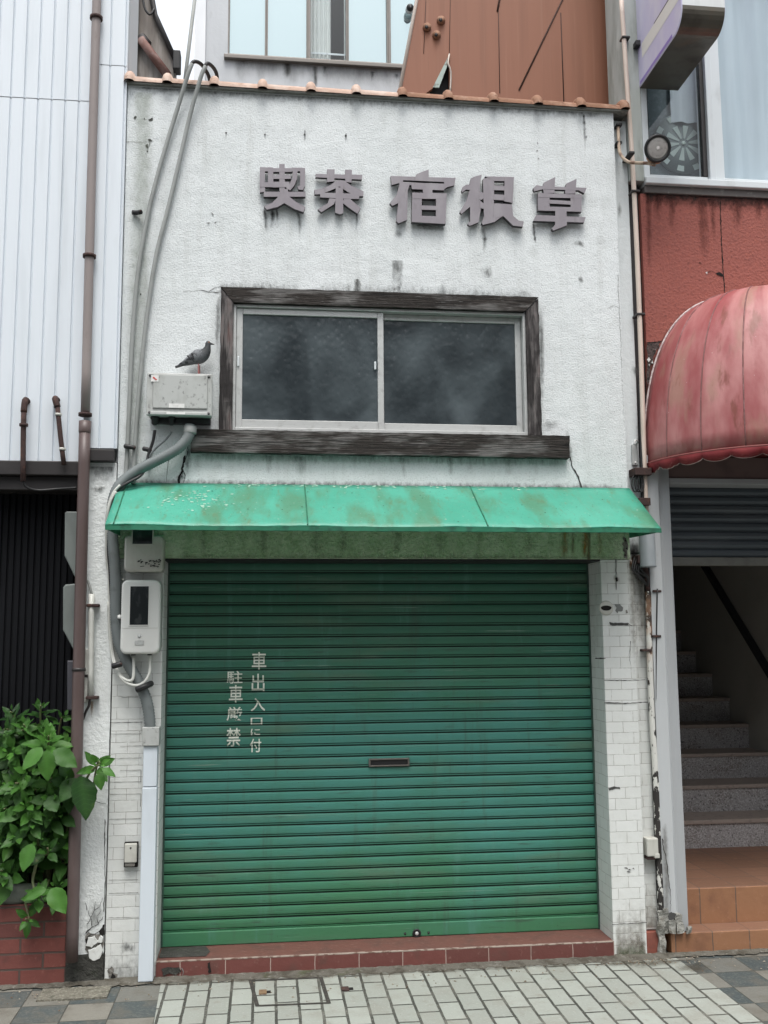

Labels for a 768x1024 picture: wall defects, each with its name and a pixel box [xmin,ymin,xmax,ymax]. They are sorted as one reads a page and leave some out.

damp [646,194,768,206]
crack [150,447,189,483]
spalling [656,839,692,953]
spalling [85,924,105,961]